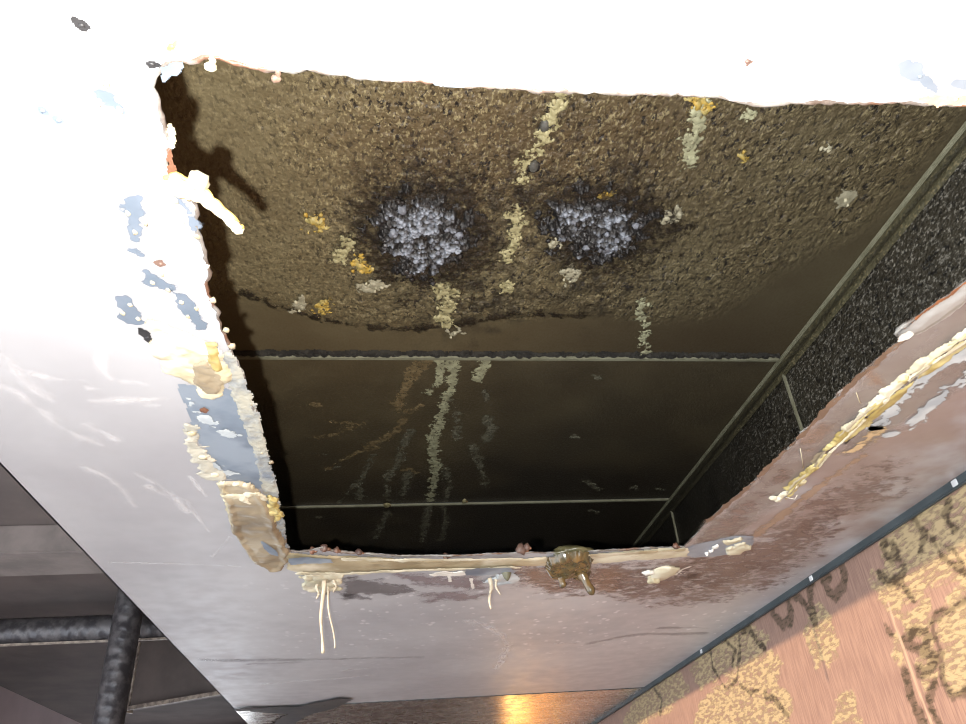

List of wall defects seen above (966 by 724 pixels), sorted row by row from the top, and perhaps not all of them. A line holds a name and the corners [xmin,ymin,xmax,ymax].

peeling [119,195,208,330]
peeling [177,384,285,523]
leakage [312,360,500,543]
peeling [701,303,966,542]
peeling [642,570,660,584]